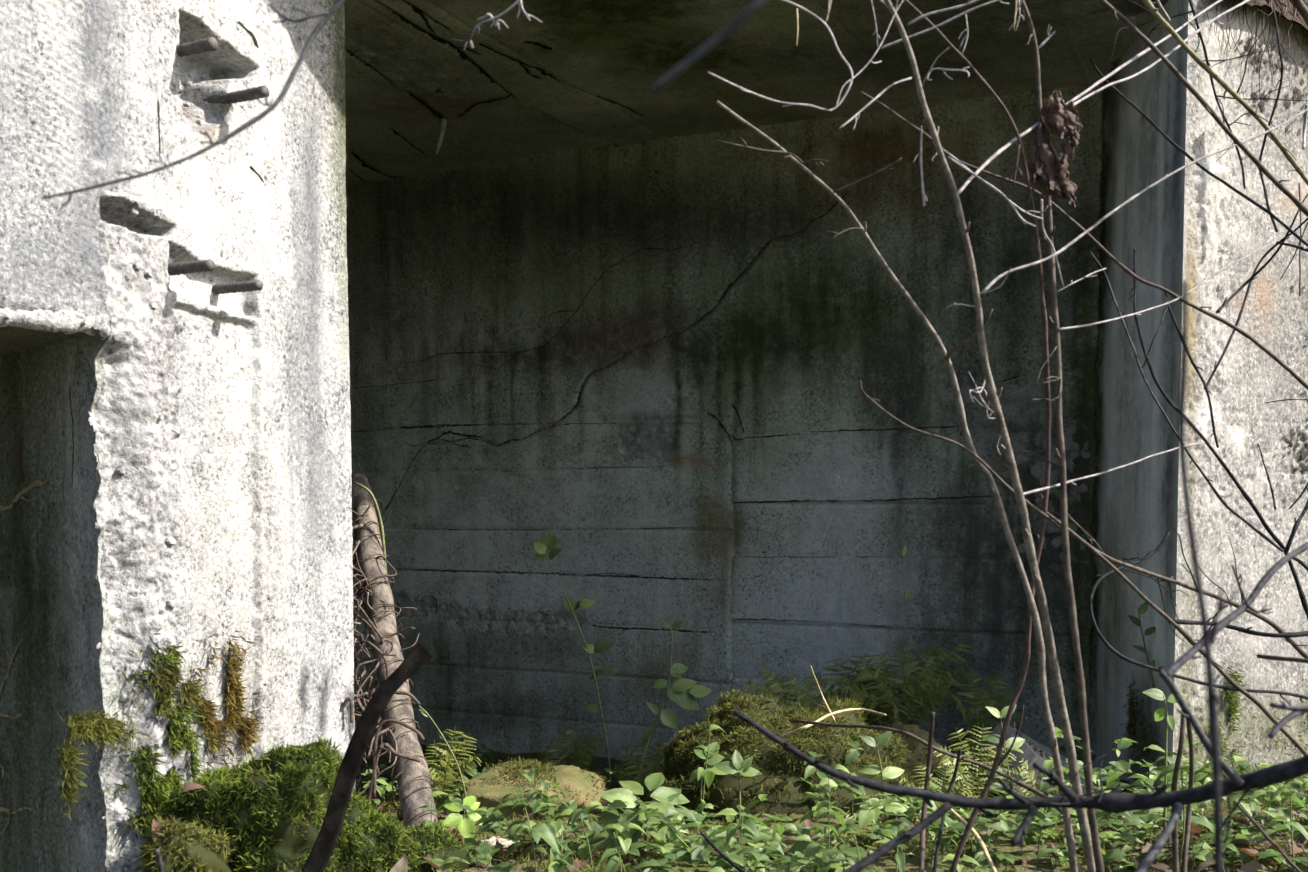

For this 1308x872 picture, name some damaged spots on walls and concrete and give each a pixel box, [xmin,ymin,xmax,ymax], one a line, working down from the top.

spalling [176,37,218,57]
spalling [183,85,270,125]
crack [348,0,560,119]
crack [350,152,397,183]
crack [352,191,849,532]
spalling [0,189,263,872]